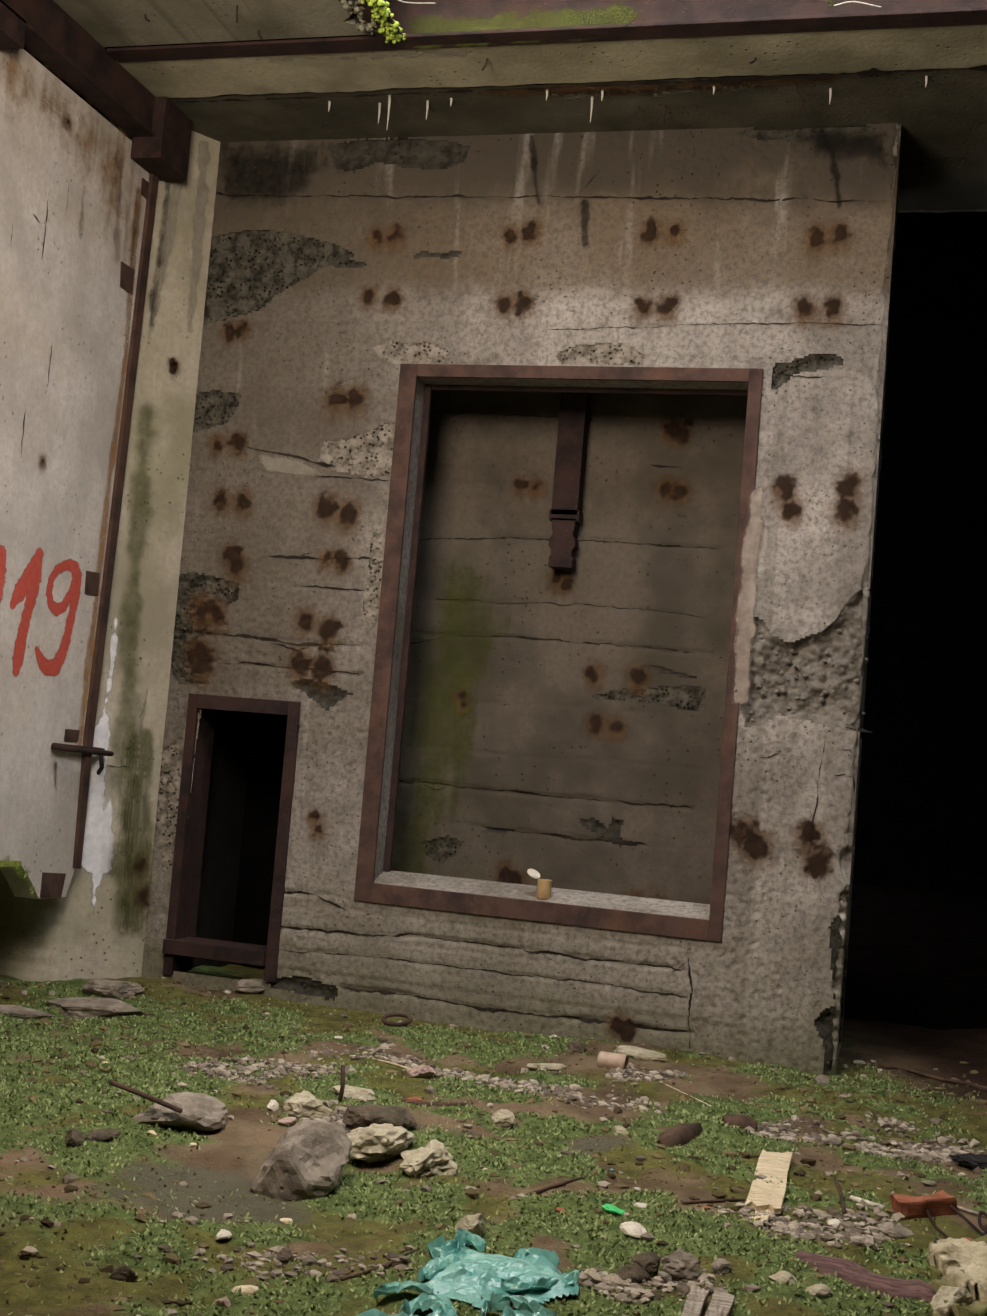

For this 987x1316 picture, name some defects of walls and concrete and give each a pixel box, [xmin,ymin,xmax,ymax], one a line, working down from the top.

spalling [203,230,367,325]
rust [328,382,364,410]
spalling [771,354,844,390]
rust [317,493,358,529]
rust [773,475,801,522]
rust [834,472,860,524]
rust [291,611,342,680]
spalling [592,665,706,712]
spalling [741,588,869,739]
rust [729,820,770,859]
rust [798,821,834,878]
spalling [814,897,848,1075]